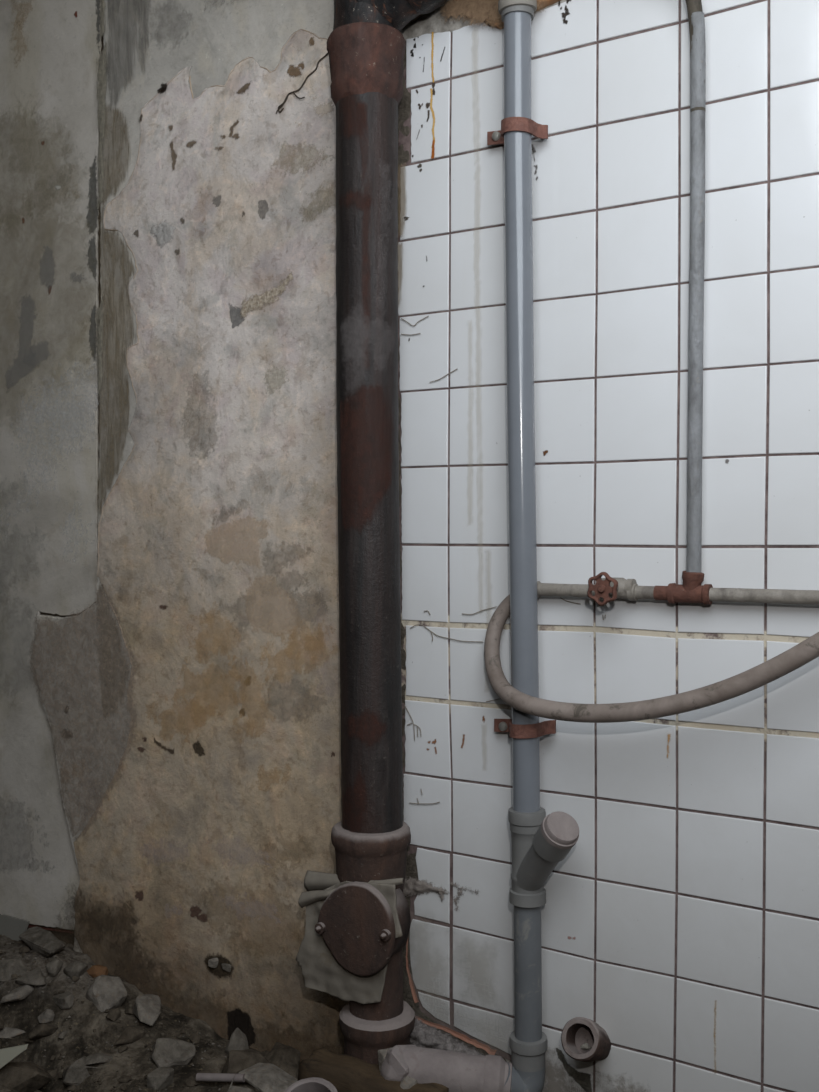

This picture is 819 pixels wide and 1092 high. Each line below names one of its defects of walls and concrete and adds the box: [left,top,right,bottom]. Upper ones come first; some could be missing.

spalling [398,7,476,169]
damp [97,106,134,512]
peeling [28,0,349,1062]